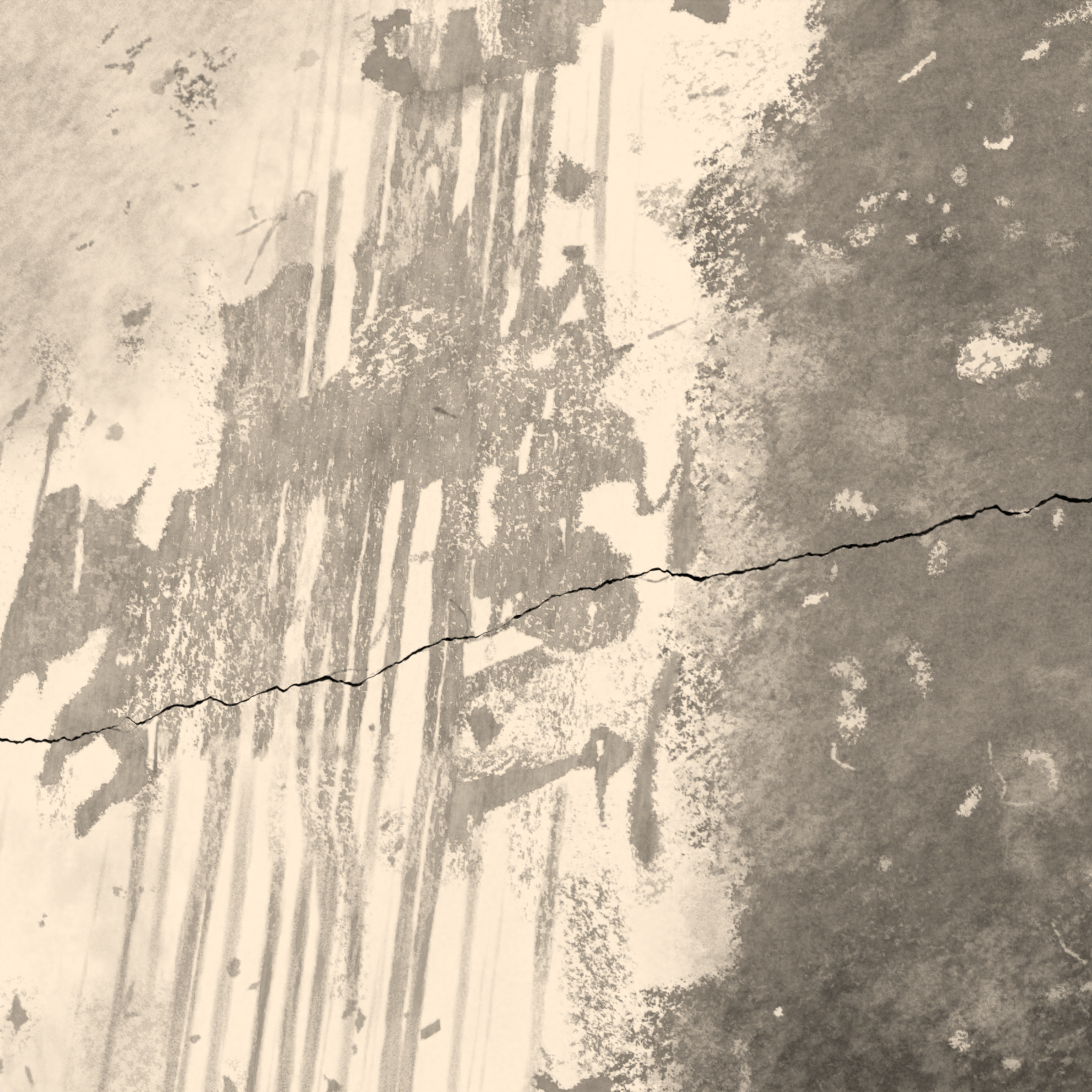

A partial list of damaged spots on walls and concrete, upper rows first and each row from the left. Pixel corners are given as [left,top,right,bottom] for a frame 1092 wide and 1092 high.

damp [34,438,52,525]
crack [0,494,1092,744]
damp [120,796,150,990]
damp [175,757,233,1012]
damp [247,867,281,1092]
damp [279,878,307,1091]
damp [298,751,354,1063]
damp [349,901,362,981]
damp [386,751,459,1066]
damp [536,797,562,960]
damp [720,983,939,1092]
damp [920,951,1092,1092]